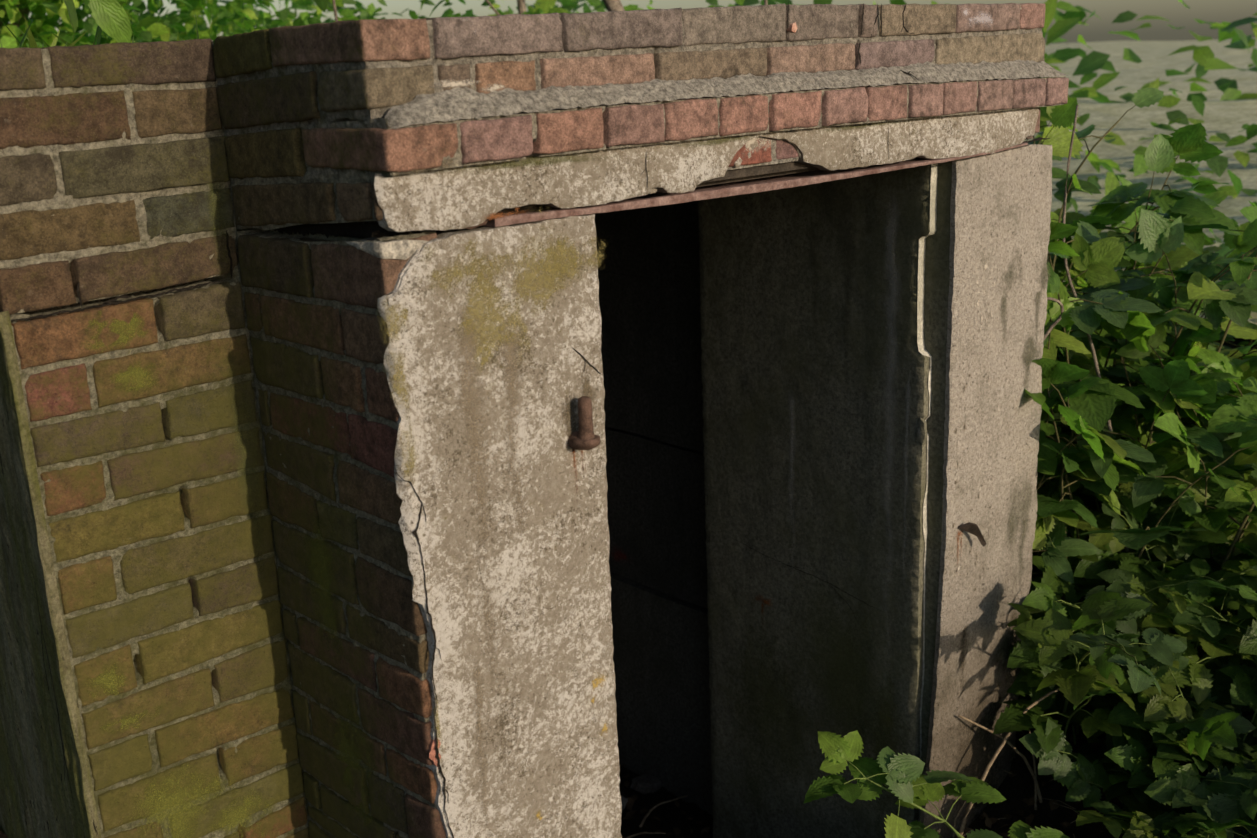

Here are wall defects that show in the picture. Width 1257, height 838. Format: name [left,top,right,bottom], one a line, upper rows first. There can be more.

spalling [733,136,802,168]
peeling [431,219,530,370]
crack [396,471,454,838]